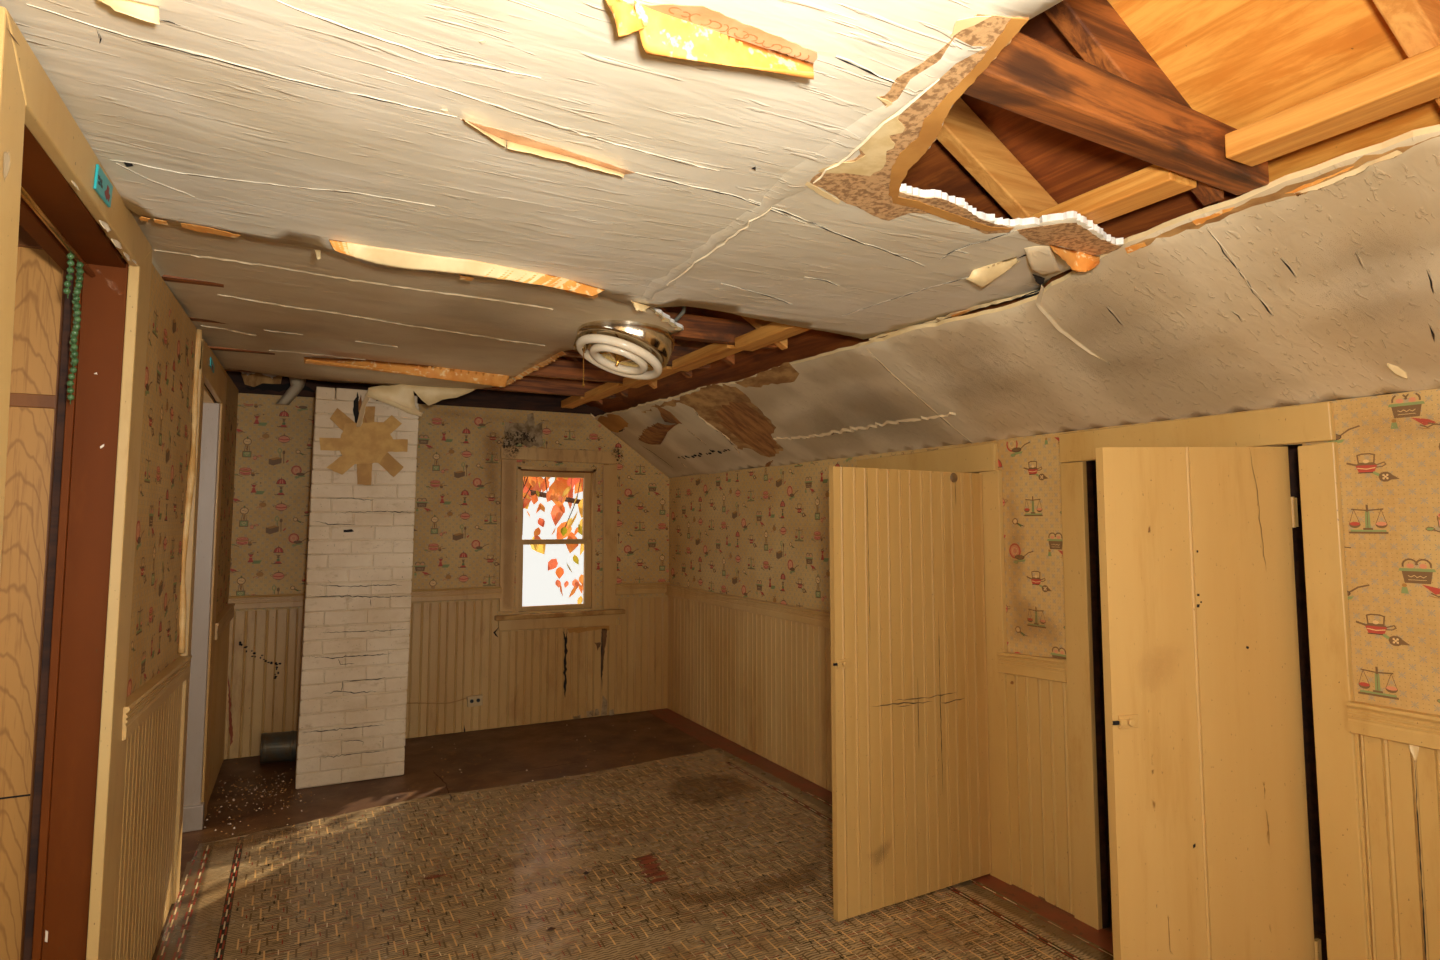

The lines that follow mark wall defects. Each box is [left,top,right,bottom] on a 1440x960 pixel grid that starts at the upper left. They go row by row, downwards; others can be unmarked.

crack [8,0,1017,316]
crack [154,249,553,360]
peeling [241,357,509,405]
flaking render [503,413,543,448]
peeling [597,362,799,467]